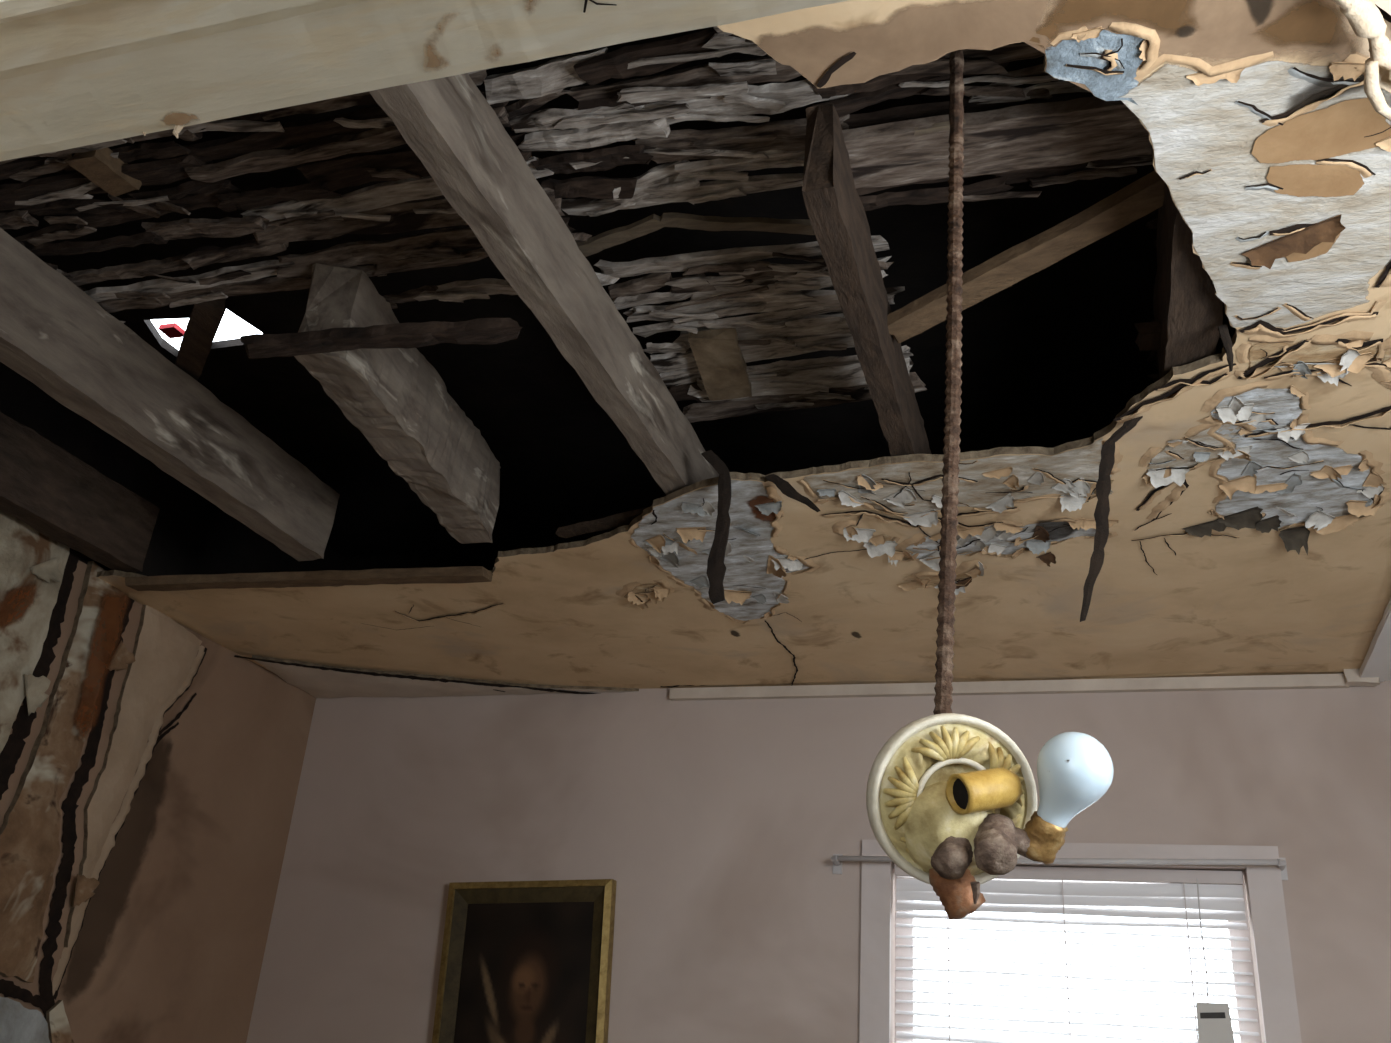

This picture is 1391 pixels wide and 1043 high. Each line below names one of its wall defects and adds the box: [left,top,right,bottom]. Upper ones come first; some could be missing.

crack [583,0,617,13]
peeling [1247,0,1272,24]
peeling [163,113,198,138]
peeling [796,22,1391,595]
peeling [616,480,820,637]
crack [0,548,82,800]
crack [0,597,601,1020]